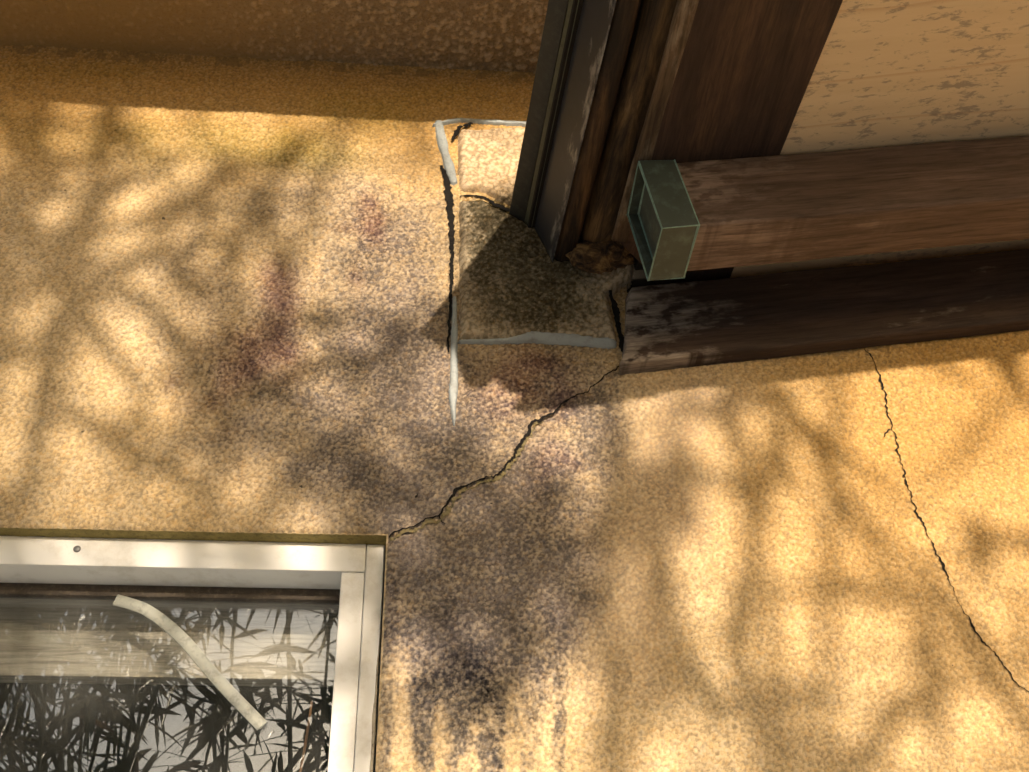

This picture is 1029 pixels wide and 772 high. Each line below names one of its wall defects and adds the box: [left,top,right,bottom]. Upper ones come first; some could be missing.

crack [451,122,473,141]
crack [439,165,510,352]
crack [389,290,624,542]
crack [864,348,1029,692]